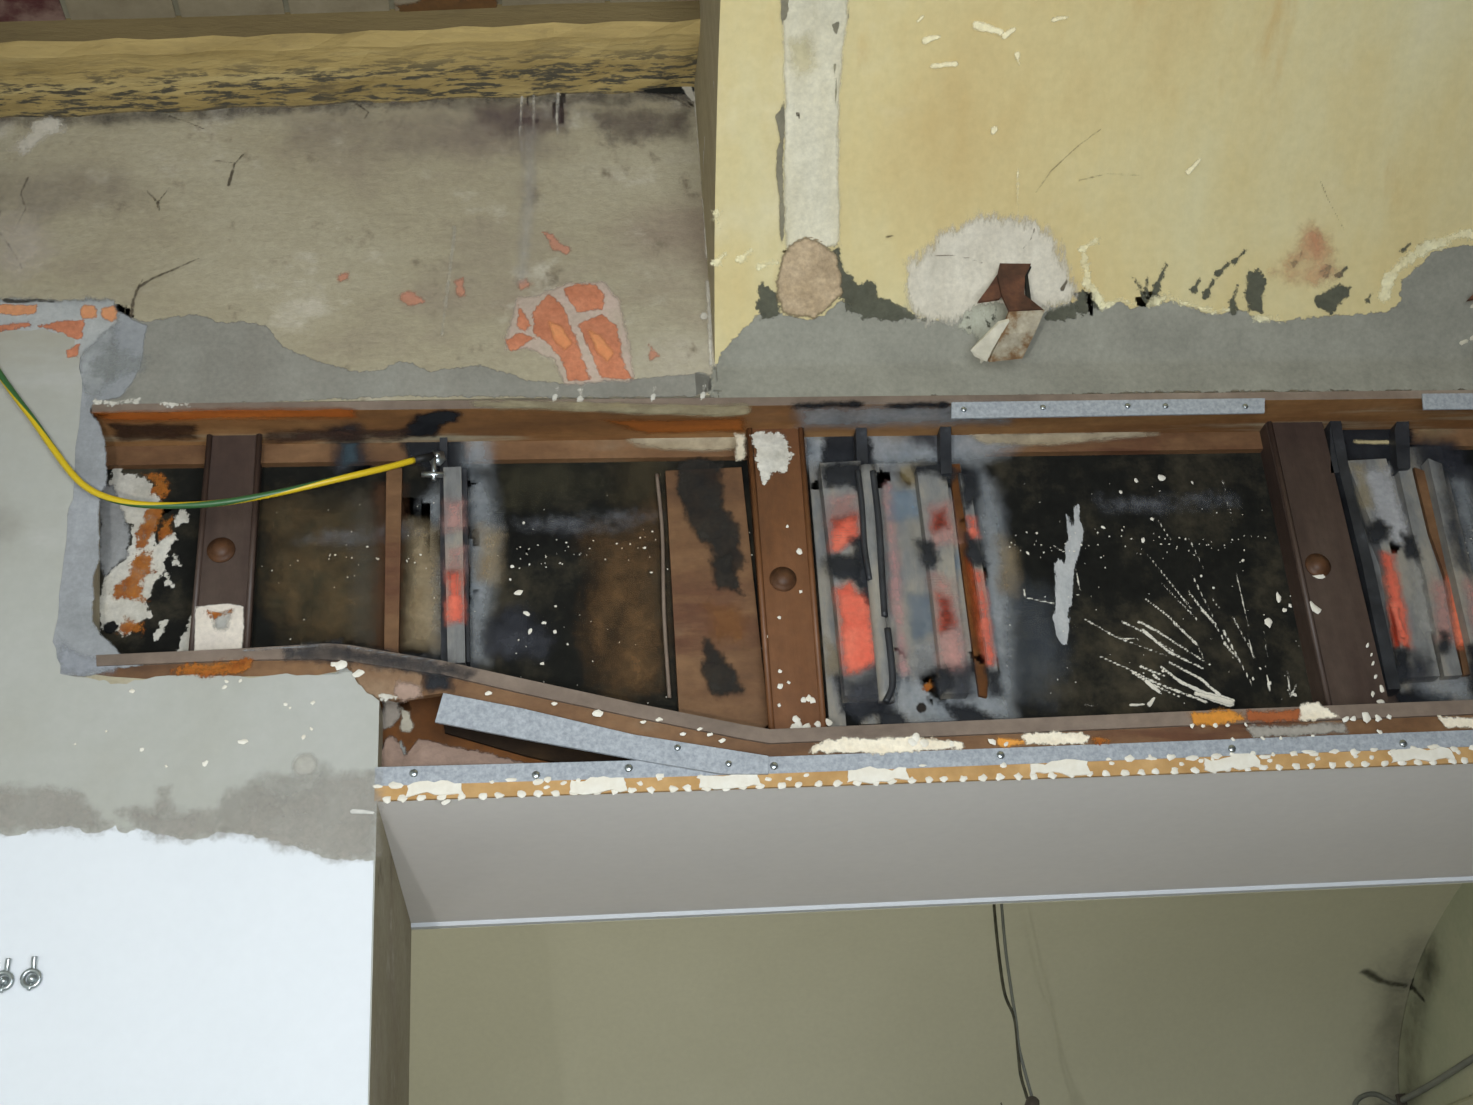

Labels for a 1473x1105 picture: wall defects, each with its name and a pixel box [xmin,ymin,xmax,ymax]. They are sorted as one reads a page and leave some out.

flaking render [682,87,701,170]
crack [217,155,242,186]
crack [130,258,199,317]
flaking render [0,199,1473,408]
peeling [174,509,190,527]
peeling [164,555,182,588]
peeling [153,616,191,651]
leakage [241,778,378,858]